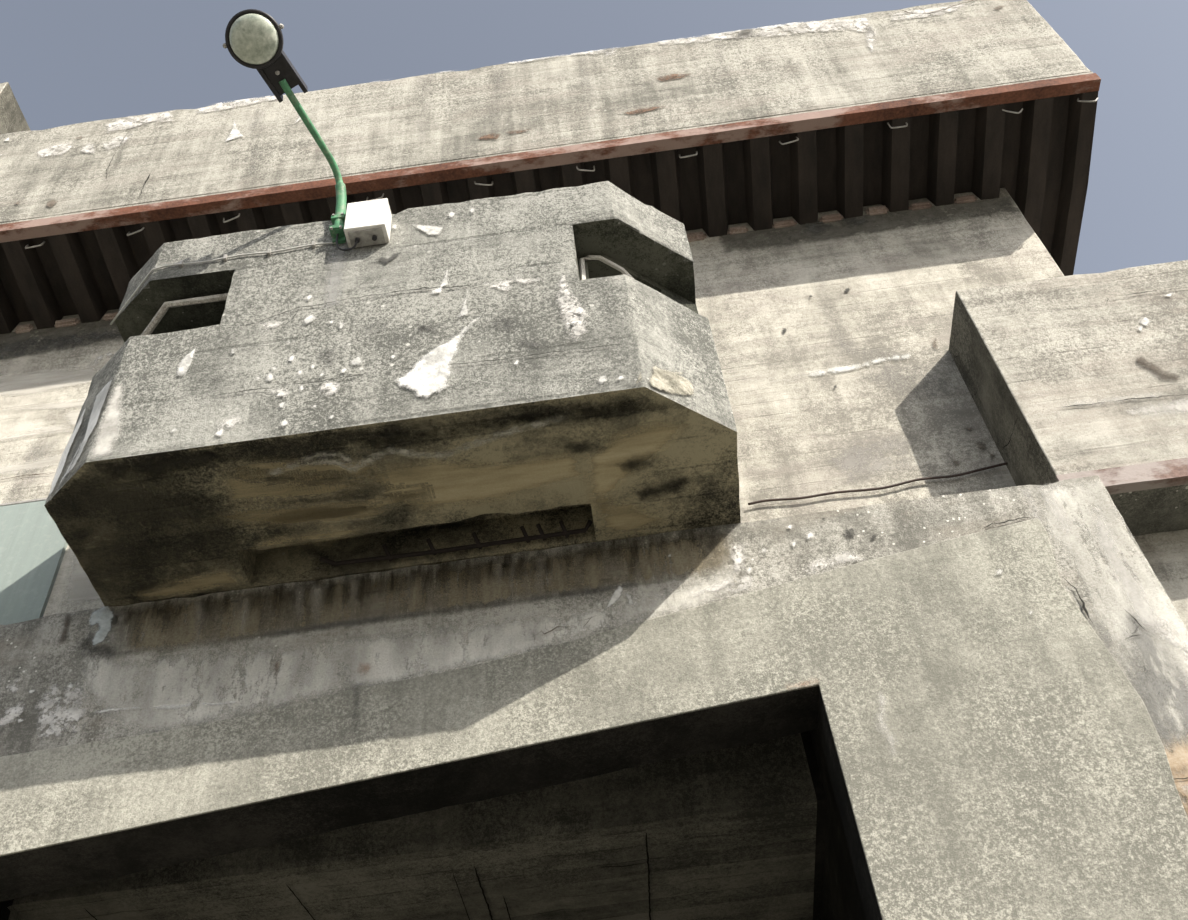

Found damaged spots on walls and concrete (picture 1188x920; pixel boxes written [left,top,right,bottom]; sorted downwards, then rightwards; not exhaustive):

corrosion [657,73,691,81]
peeling [397,301,475,397]
leakage [272,398,643,475]
leakage [0,386,251,599]
leakage [639,479,688,498]
leakage [812,553,859,570]
leakage [38,533,750,737]
leakage [0,681,23,725]
crack [608,833,651,920]